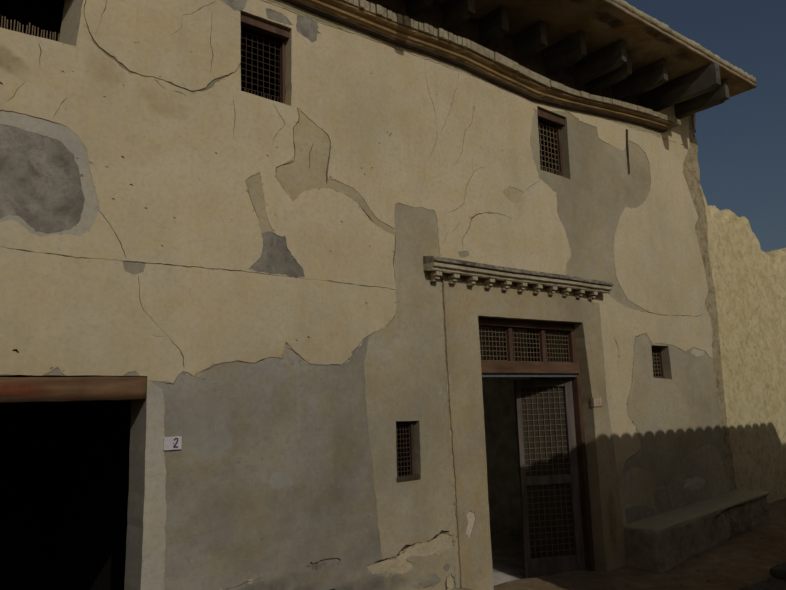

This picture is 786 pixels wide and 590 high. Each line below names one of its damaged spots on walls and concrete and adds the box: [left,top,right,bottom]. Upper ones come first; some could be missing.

spalling [0,110,100,237]
crack [83,5,241,95]
spalling [152,111,460,590]
spalling [623,115,737,519]